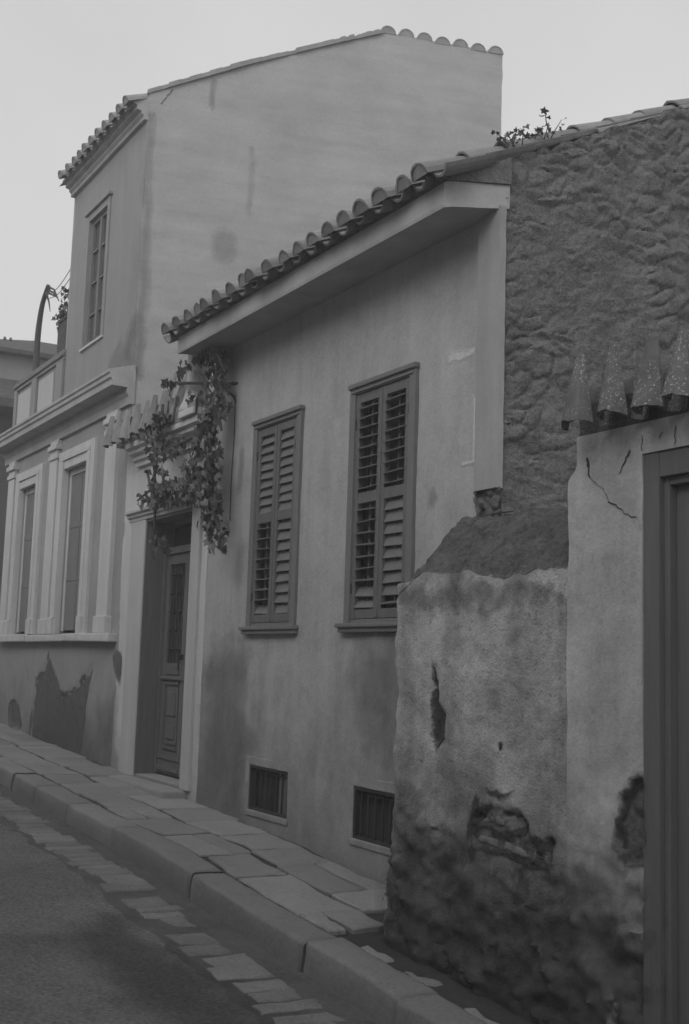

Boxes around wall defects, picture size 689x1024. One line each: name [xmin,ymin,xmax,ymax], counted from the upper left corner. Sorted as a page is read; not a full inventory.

crack [586,425,677,518]
flaking render [8,653,93,755]
flaking render [430,665,446,750]
flaking render [466,787,556,880]
flaking render [612,776,646,867]